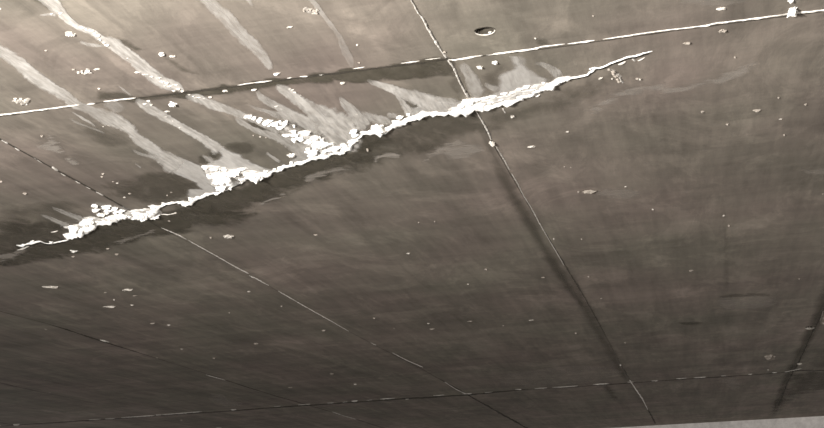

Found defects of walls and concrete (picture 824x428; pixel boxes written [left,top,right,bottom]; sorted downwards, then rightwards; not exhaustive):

water stain [0,0,570,265]
crack [16,51,653,250]